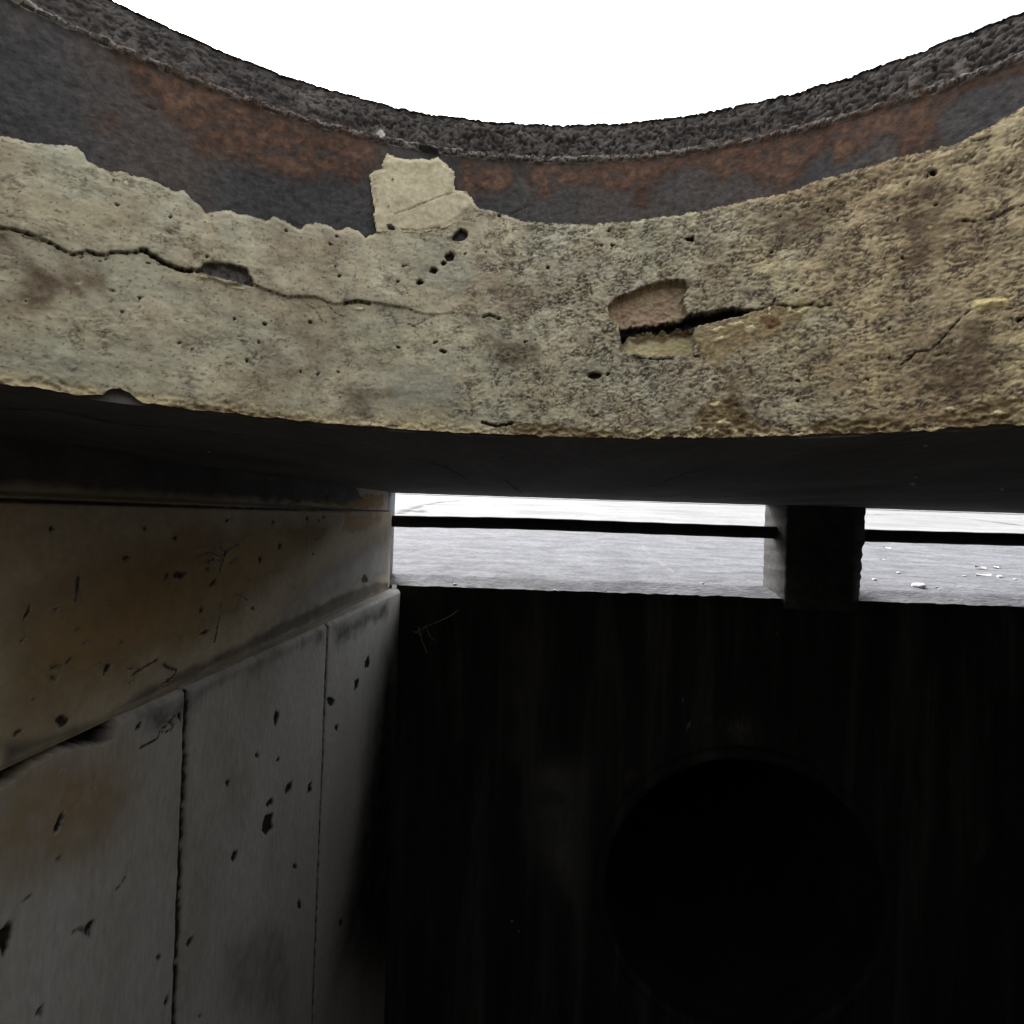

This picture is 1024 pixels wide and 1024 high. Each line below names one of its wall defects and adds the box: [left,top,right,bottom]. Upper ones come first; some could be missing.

crack [2,228,193,273]
spalling [198,263,253,289]
spalling [608,281,832,360]